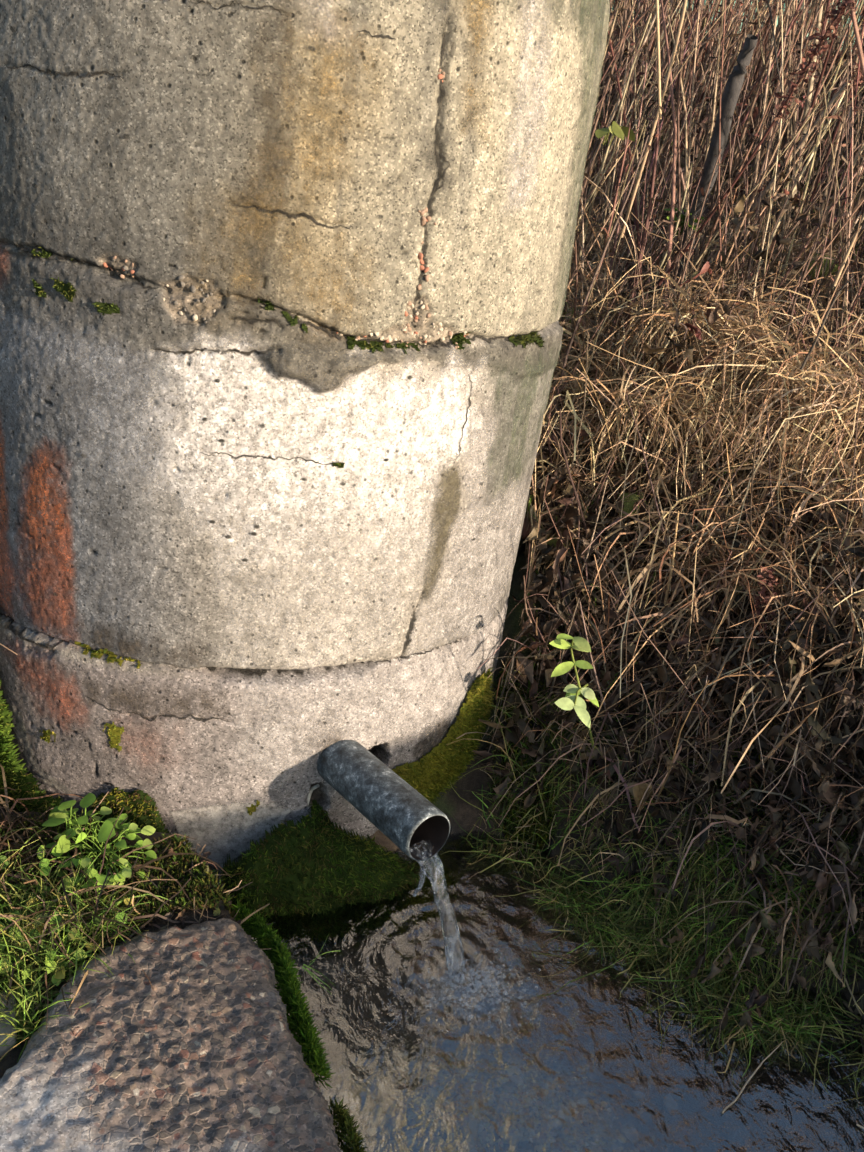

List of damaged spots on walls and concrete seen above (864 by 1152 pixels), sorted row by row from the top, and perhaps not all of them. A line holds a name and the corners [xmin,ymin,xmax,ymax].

crack [190,0,288,16]
crack [153,23,543,356]
spalling [418,207,437,226]
peeling [22,241,493,569]
crack [200,452,333,465]
crack [454,376,472,464]
rust [23,445,72,626]
leakage [422,468,460,599]